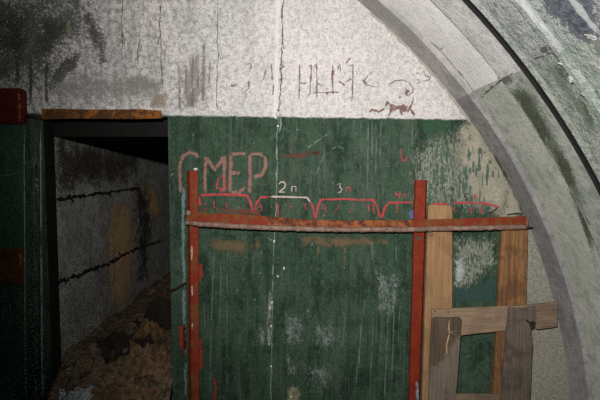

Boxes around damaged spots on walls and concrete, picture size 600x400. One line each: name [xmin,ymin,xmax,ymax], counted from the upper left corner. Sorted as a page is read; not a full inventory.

damp [0,0,160,104]
crack [156,6,164,85]
damp [178,44,210,110]
crack [273,0,285,118]
peeling [411,119,522,218]
rust [209,239,261,260]
rust [301,235,388,260]